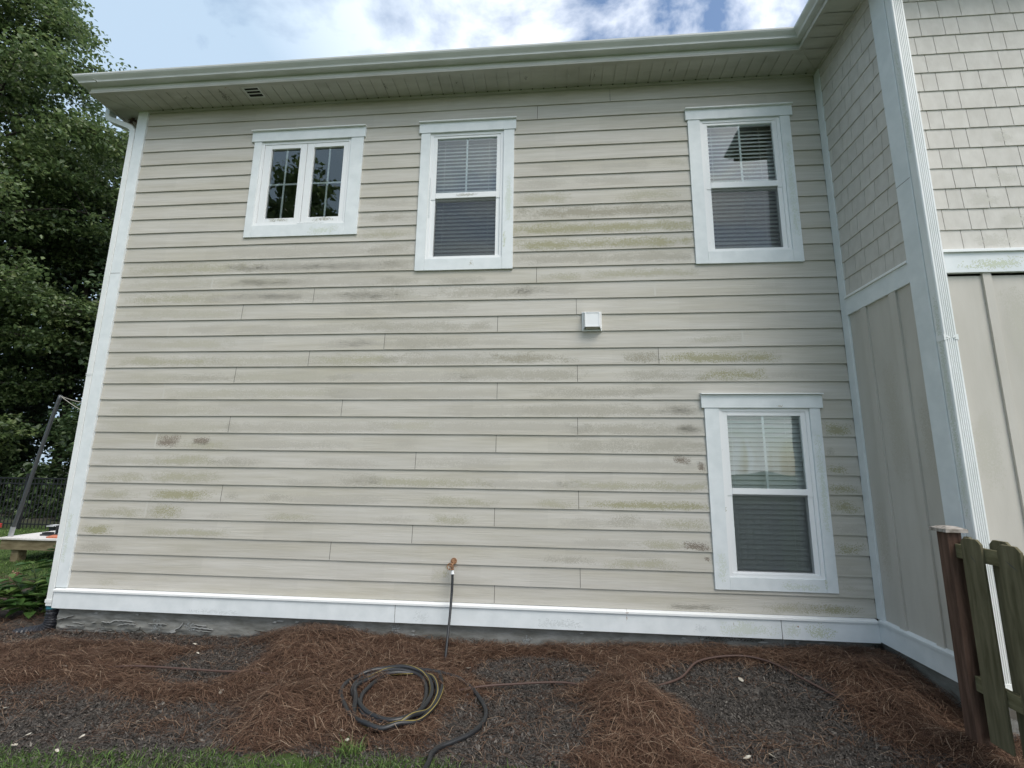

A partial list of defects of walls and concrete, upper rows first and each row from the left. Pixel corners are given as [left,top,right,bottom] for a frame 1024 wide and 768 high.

mould [513,202,693,220]
mould [663,602,737,611]